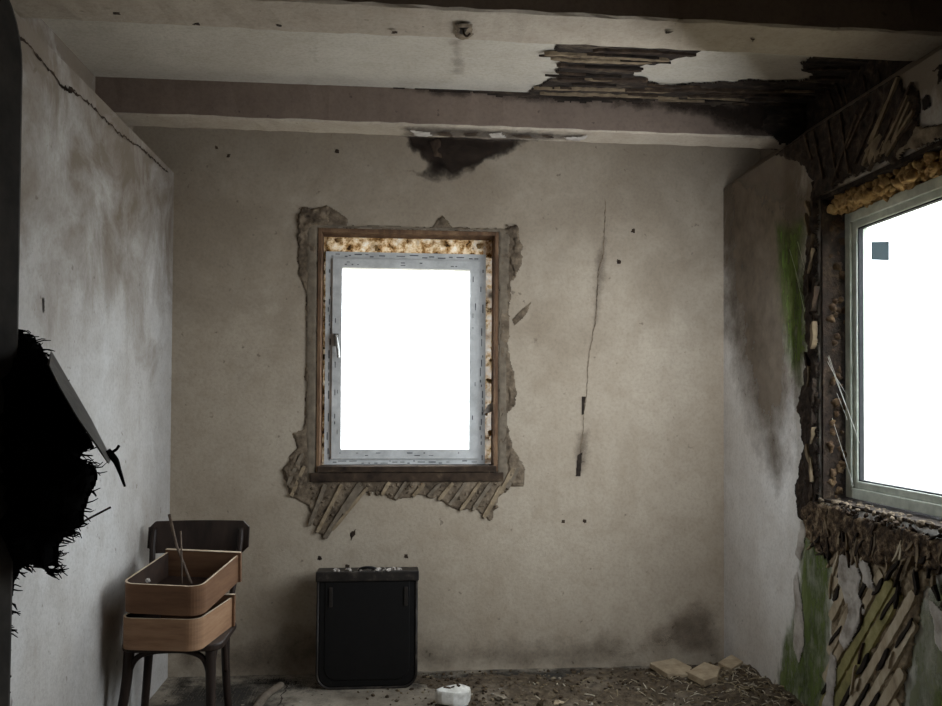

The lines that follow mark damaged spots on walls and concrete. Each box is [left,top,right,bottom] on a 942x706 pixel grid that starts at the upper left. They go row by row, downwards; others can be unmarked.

crack [20,37,169,173]
damp [409,136,518,178]
flaking render [774,59,942,228]
spalling [282,205,531,539]
flaking render [795,501,942,706]